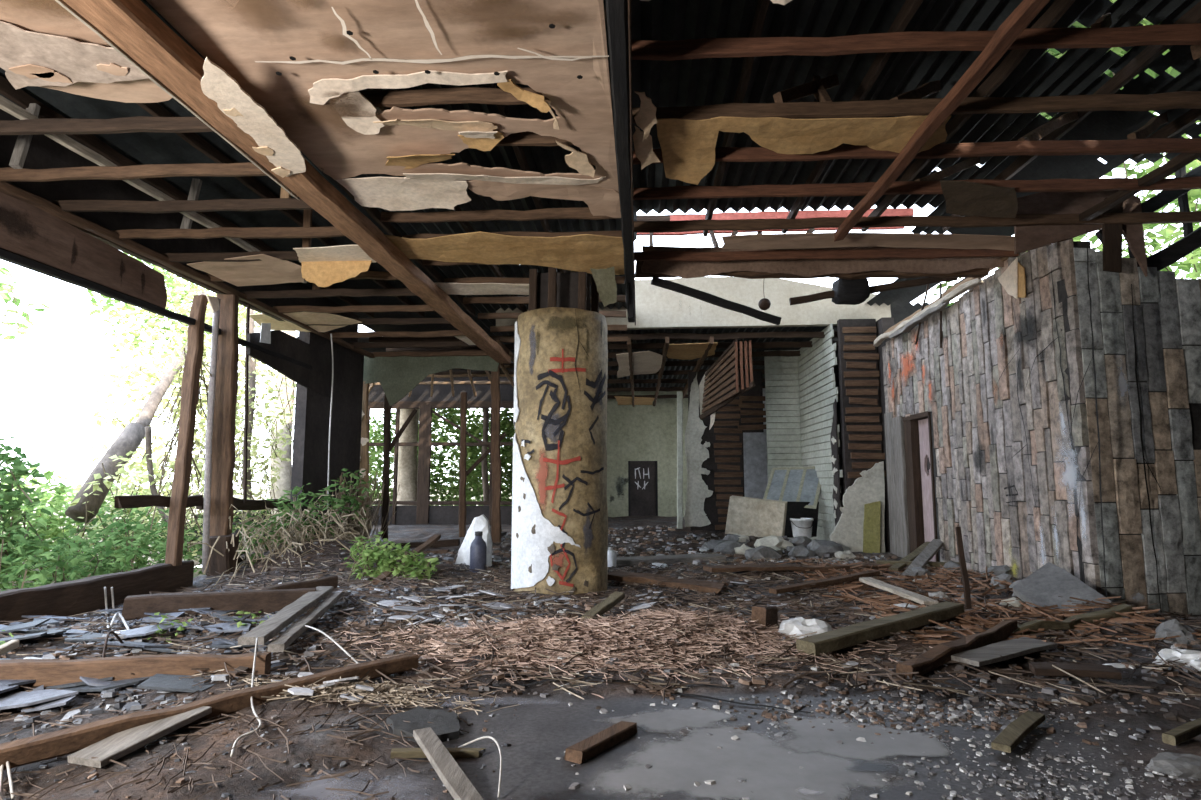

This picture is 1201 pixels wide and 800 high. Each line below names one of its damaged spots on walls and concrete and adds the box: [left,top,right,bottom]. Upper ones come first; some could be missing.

peeling [0,21,148,89]
damp [231,0,280,29]
crack [255,0,609,64]
peeling [308,70,606,185]
peeling [511,321,581,589]
flaking render [684,375,713,527]
flaking render [829,399,885,553]